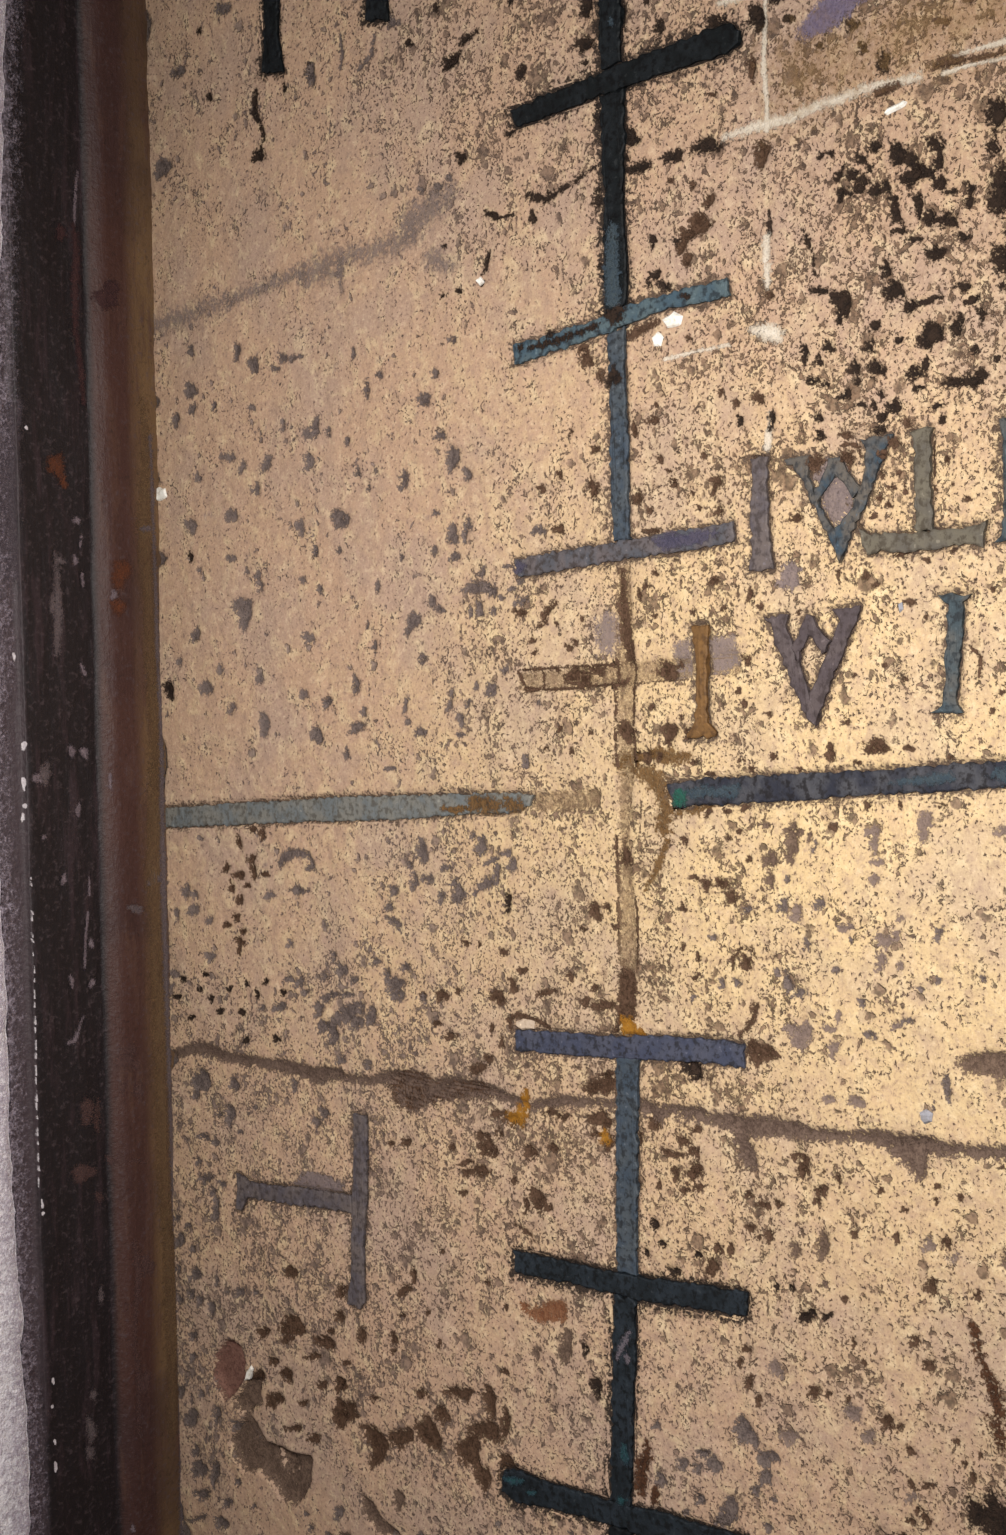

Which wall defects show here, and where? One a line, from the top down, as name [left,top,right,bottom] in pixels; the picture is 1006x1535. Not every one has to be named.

crack [173,1039,1006,1183]